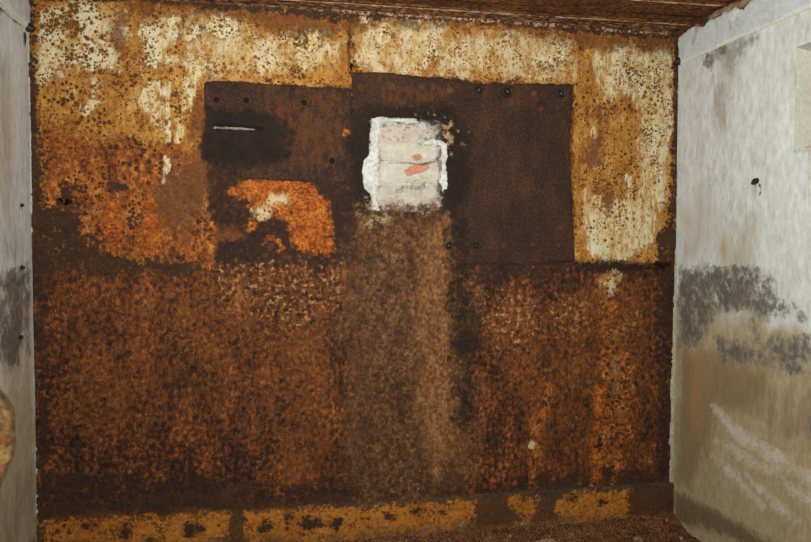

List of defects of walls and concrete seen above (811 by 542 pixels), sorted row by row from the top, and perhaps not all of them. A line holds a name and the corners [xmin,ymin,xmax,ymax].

rust [30,0,419,279]
flaking render [405,154,429,175]
damp [0,264,31,367]
rust [35,335,150,450]
rust [126,274,264,358]
rust [254,304,334,459]
rust [332,102,575,530]
rust [406,0,751,490]
damp [676,265,811,486]
damp [674,493,770,542]